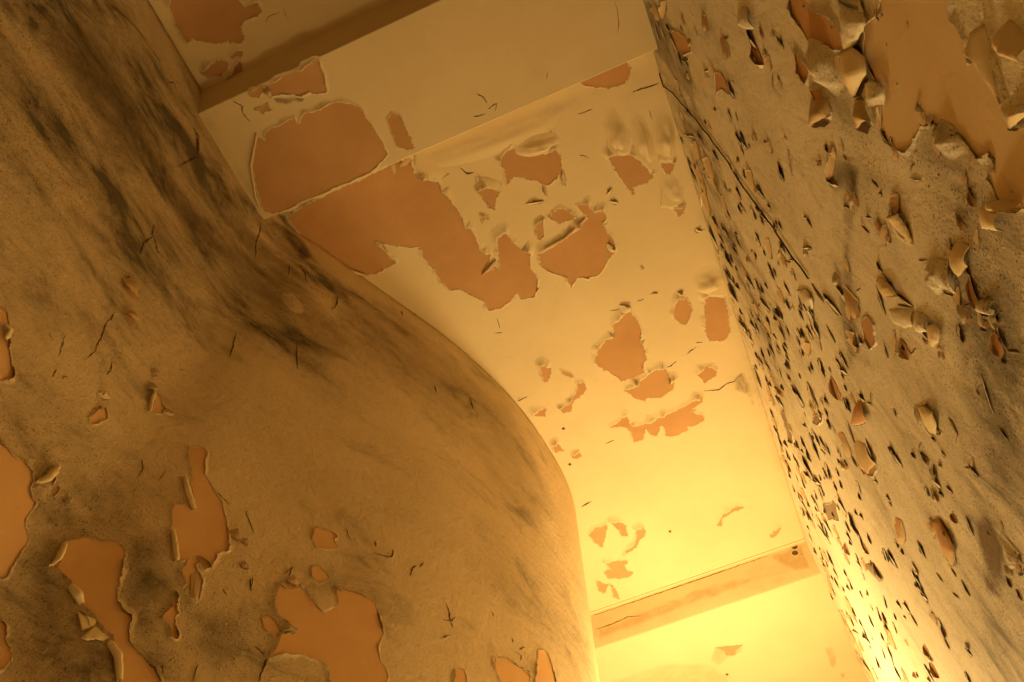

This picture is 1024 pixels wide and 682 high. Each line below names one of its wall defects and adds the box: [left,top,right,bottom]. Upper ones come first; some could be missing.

peeling [161,0,264,80]
peeling [737,0,1024,366]
peeling [248,0,959,682]
peeling [0,438,73,582]
peeling [49,531,166,682]
peeling [159,445,252,642]
peeling [926,514,973,599]
peeling [987,522,1023,602]